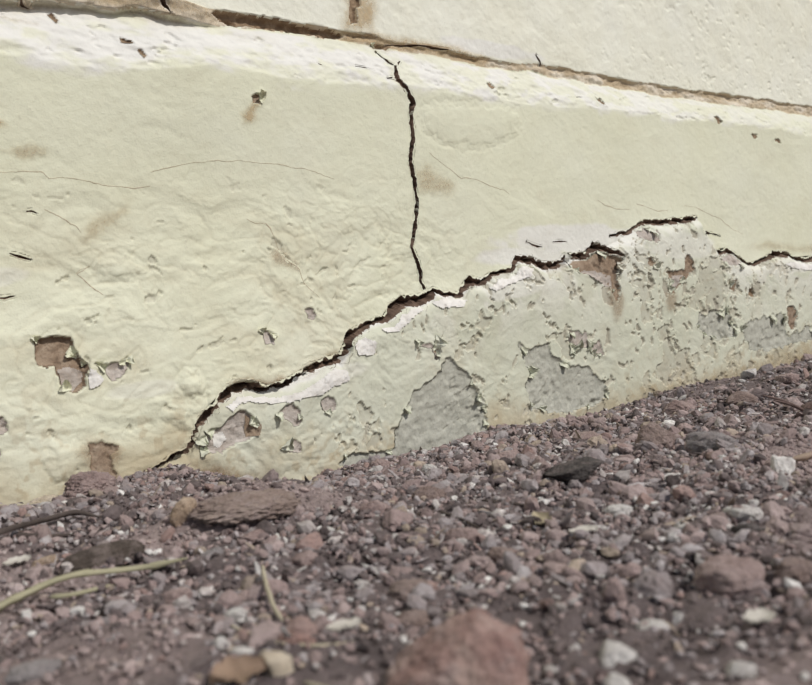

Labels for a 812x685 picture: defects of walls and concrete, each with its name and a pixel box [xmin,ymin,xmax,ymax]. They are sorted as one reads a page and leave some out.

crack [16,0,34,12]
crack [157,0,171,13]
spalling [252,89,268,104]
crack [145,43,812,471]
peeling [648,255,695,293]
spalling [258,326,279,344]
peeling [696,304,812,352]
spalling [30,336,135,393]
spalling [518,330,610,414]
spalling [339,335,489,466]
peeling [195,410,262,457]
peeling [88,441,119,477]